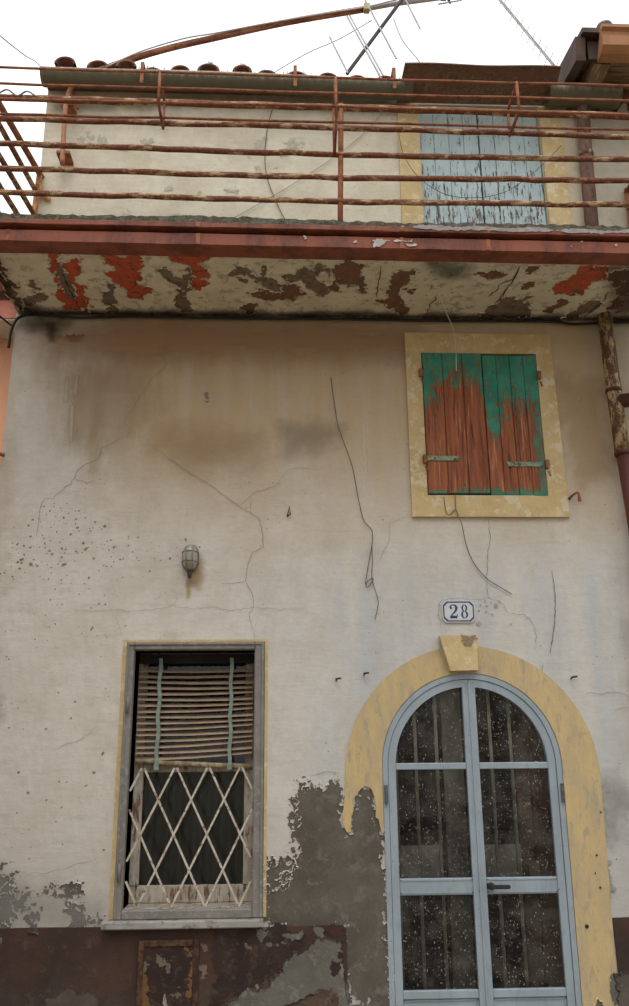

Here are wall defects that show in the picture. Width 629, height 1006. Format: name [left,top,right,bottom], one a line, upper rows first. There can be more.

peeling [372,224,629,248]
peeling [0,254,213,313]
spalling [226,260,417,315]
peeling [472,265,629,320]
crack [37,434,309,635]
peeling [0,861,106,943]
peeling [225,776,396,1006]
peeling [39,989,103,1006]
peeling [142,944,208,1006]
spalling [593,969,629,1006]